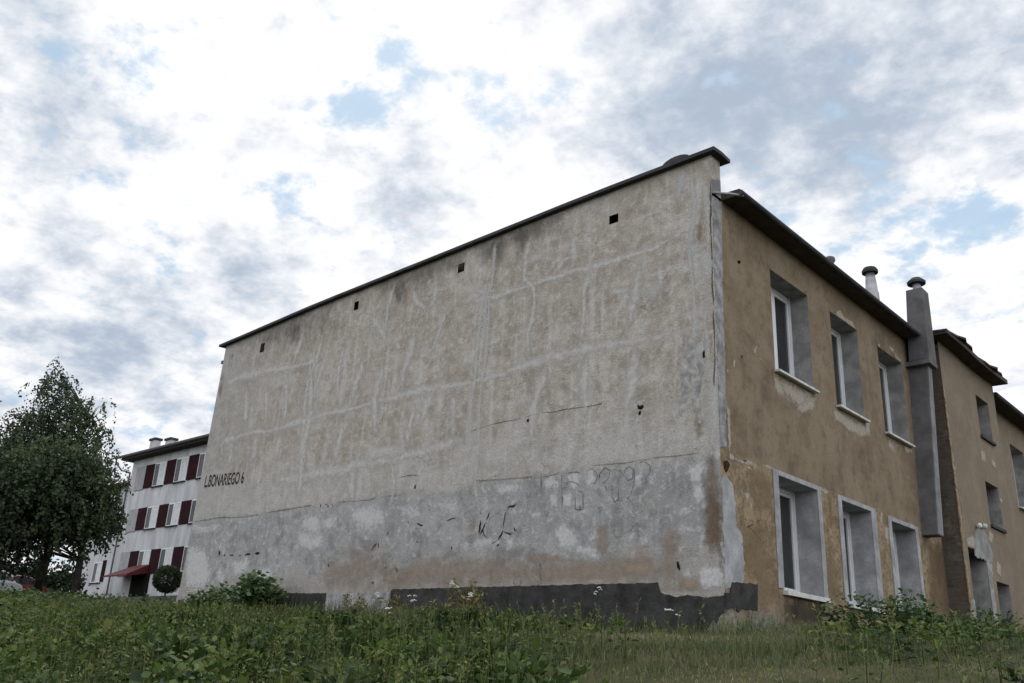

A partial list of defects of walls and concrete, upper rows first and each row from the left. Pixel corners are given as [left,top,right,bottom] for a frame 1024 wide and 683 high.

flaking render [774,375,815,413]
flaking render [834,410,870,436]
flaking render [688,454,772,504]